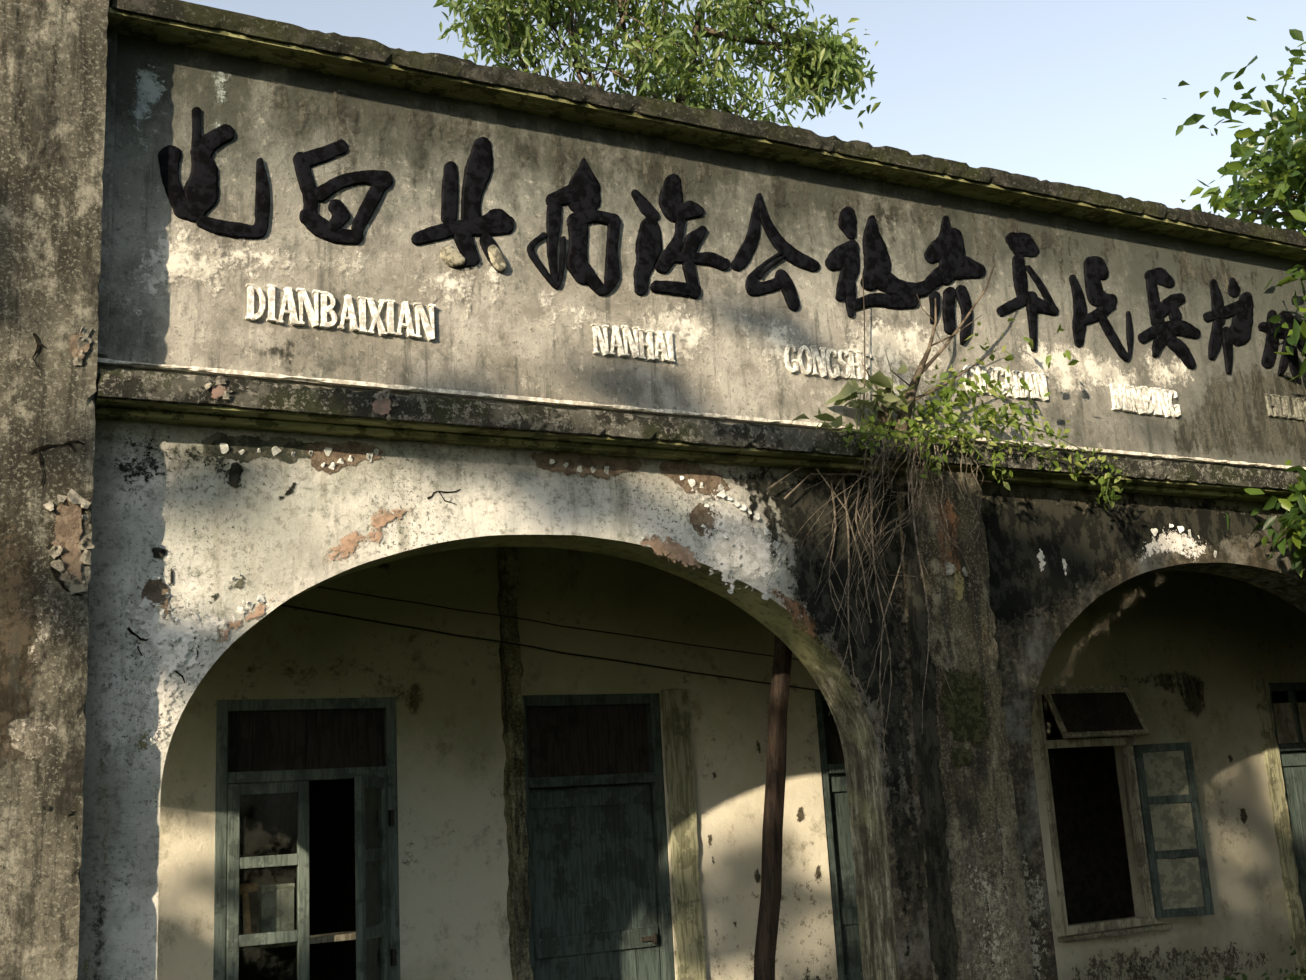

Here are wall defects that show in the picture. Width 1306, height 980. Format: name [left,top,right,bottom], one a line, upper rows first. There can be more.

water stain [0,516,49,765]
spalling [43,488,95,596]
flaking render [122,547,273,763]
peeling [201,432,383,475]
peeling [326,506,412,570]
peeling [528,451,642,480]
flaking render [640,460,783,600]
water stain [728,466,1050,980]
water stain [981,485,1276,686]
water stain [1068,941,1269,980]